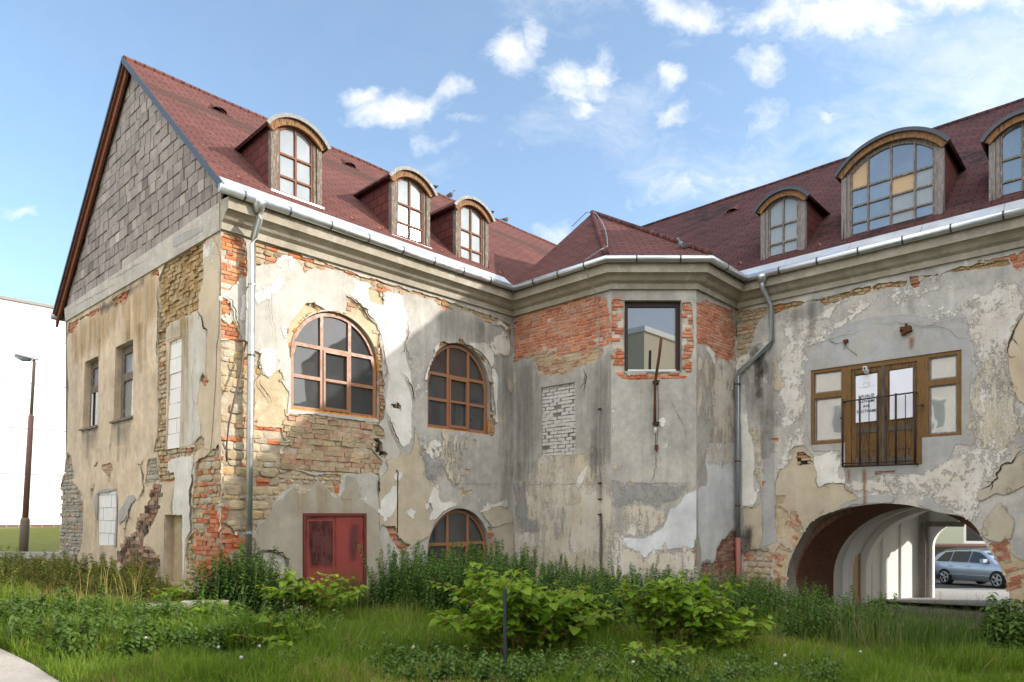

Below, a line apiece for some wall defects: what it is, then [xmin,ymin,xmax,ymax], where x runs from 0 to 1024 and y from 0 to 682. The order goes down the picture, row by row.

peeling [117,233,1024,606]
crack [981,449,1024,491]
leakage [513,483,538,533]